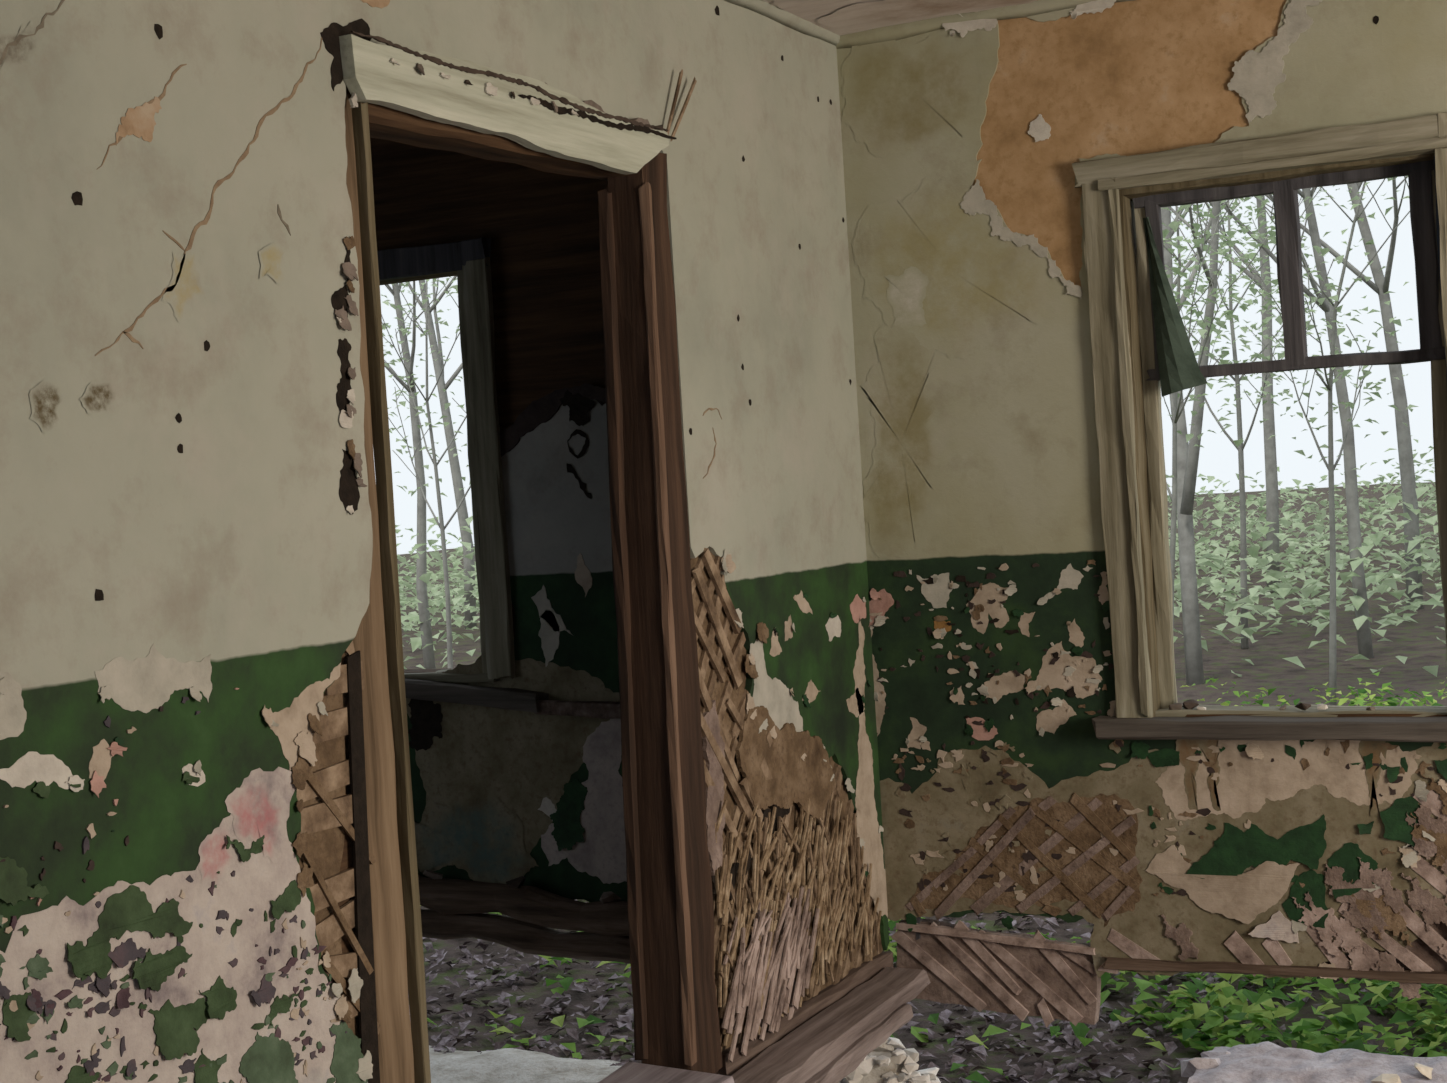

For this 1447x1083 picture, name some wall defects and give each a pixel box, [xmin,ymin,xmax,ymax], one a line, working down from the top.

crack [0,0,65,69]
crack [95,37,322,356]
spalling [320,0,677,139]
spalling [942,0,1323,298]
spalling [331,236,367,515]
peeling [575,553,592,597]
peeling [0,641,381,1083]
peeling [406,585,627,884]
peeling [690,548,1447,1062]